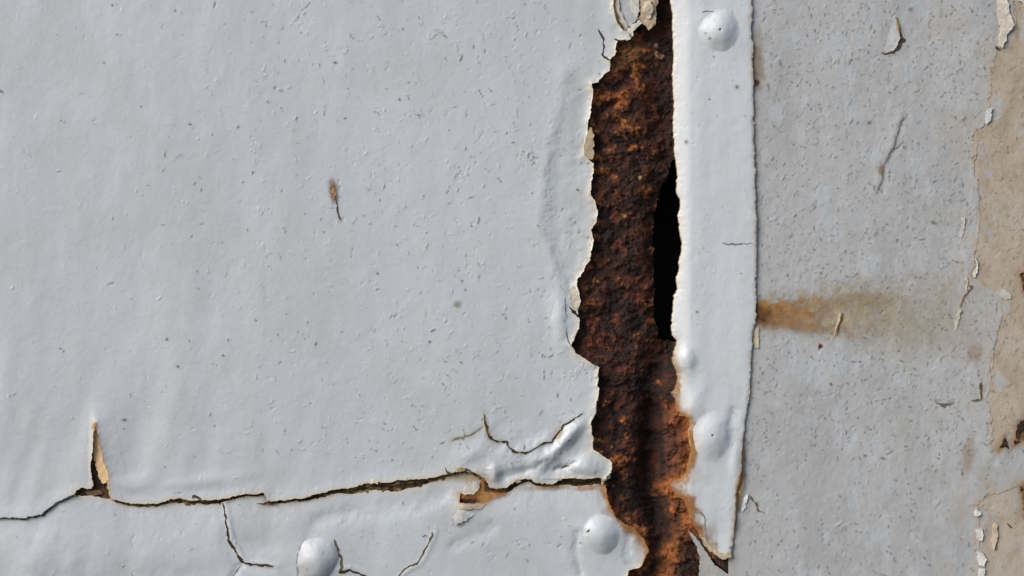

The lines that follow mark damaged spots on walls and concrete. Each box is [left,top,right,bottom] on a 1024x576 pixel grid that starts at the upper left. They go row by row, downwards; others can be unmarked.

peeling [598,0,658,60]
peeling [882,16,906,55]
rust [330,182,341,219]
peeling [954,0,1024,451]
rust [572,0,732,576]
rust [753,291,891,349]
peeling [75,424,111,499]
crack [452,413,583,454]
crack [1,495,75,520]
crack [115,465,611,576]
peeling [453,479,490,525]
peeling [974,486,1024,576]